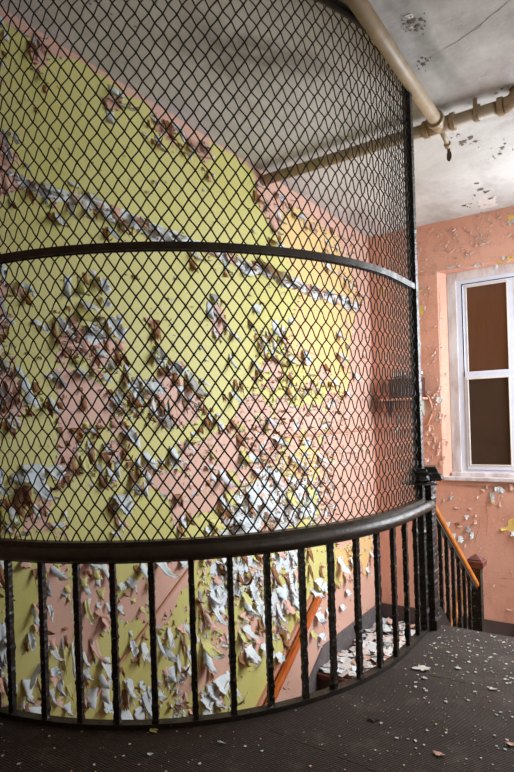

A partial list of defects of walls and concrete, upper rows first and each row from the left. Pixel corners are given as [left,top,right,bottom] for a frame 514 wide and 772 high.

spalling [401,12,426,35]
peeling [0,16,371,541]
peeling [481,484,514,507]
peeling [442,496,478,548]
peeling [500,518,514,537]
peeling [0,535,374,720]